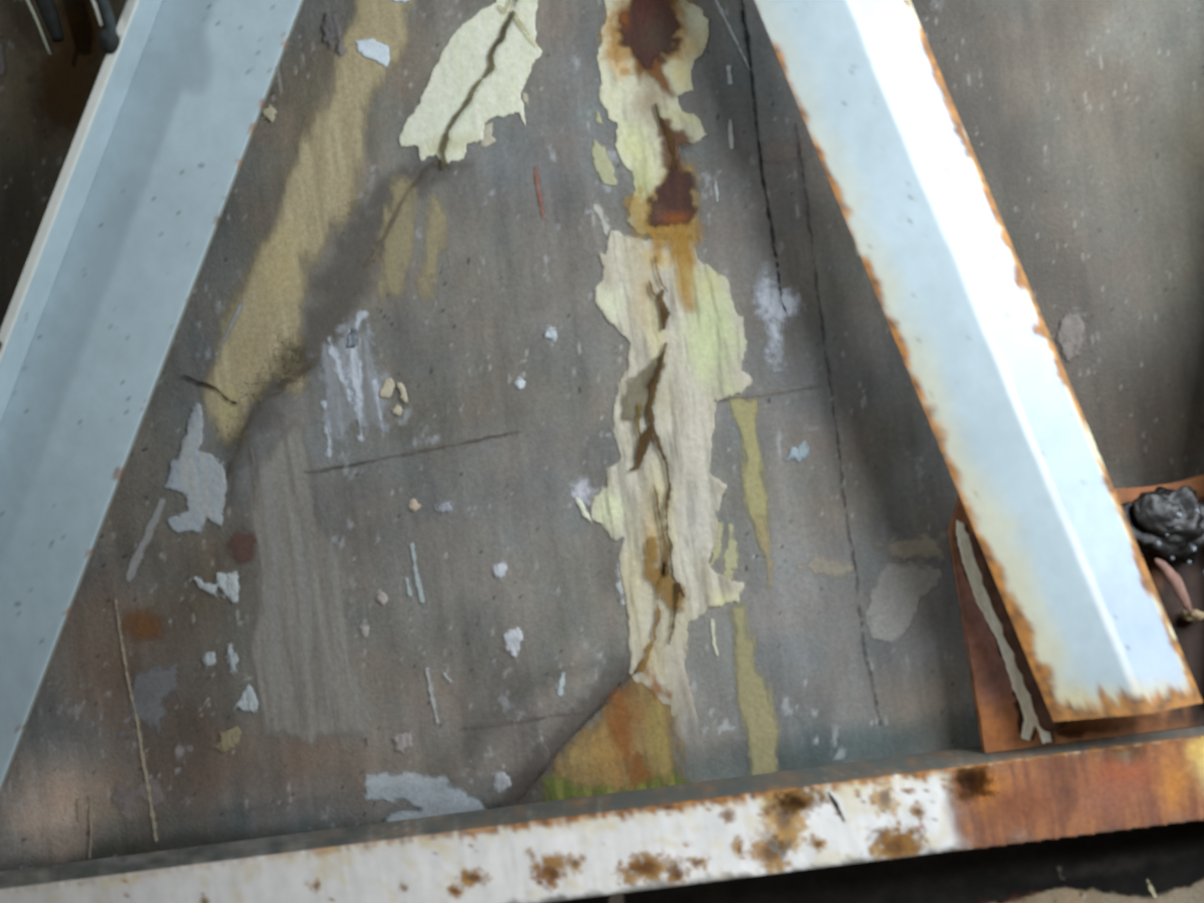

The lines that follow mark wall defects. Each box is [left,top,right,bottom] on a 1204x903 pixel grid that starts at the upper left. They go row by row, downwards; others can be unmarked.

leakage [204,0,448,466]
peeling [399,0,542,164]
corrosion [610,0,683,93]
corrosion [632,118,697,308]
crack [654,103,676,169]
crack [741,0,786,312]
peeling [575,0,753,734]
crack [465,257,685,806]
crack [716,272,881,725]
corrosion [618,853,706,884]
corrosion [869,783,924,858]
corrosion [951,736,1204,847]